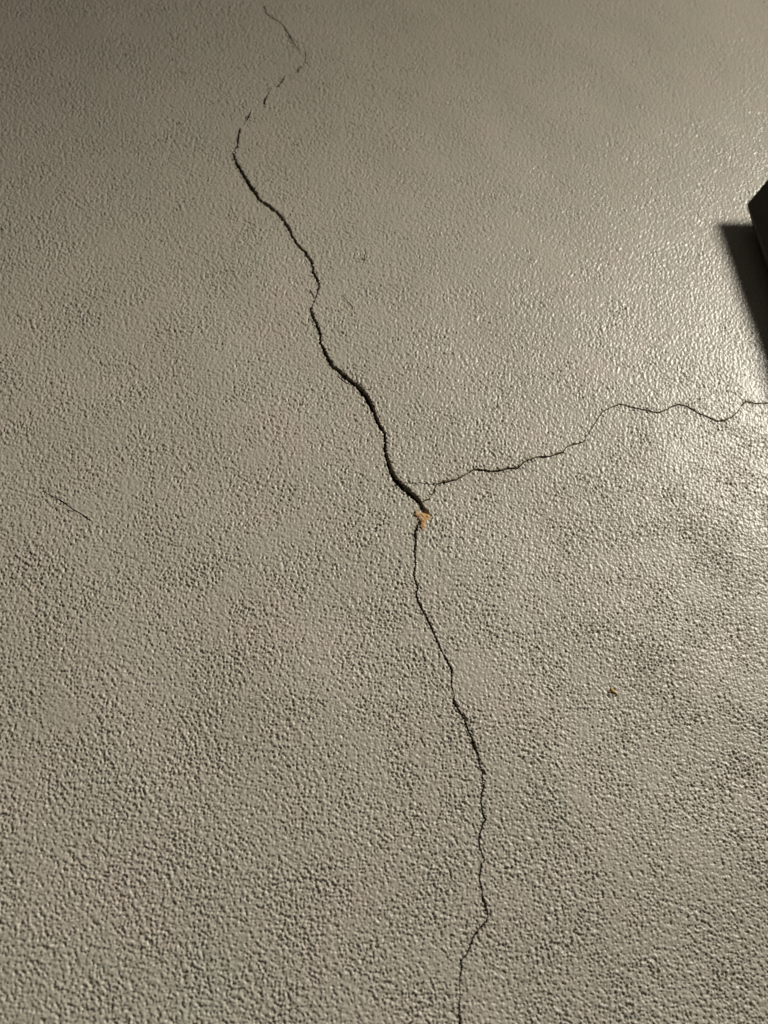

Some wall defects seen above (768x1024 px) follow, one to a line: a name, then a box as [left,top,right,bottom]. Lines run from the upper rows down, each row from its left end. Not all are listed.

crack [232,7,768,1024]